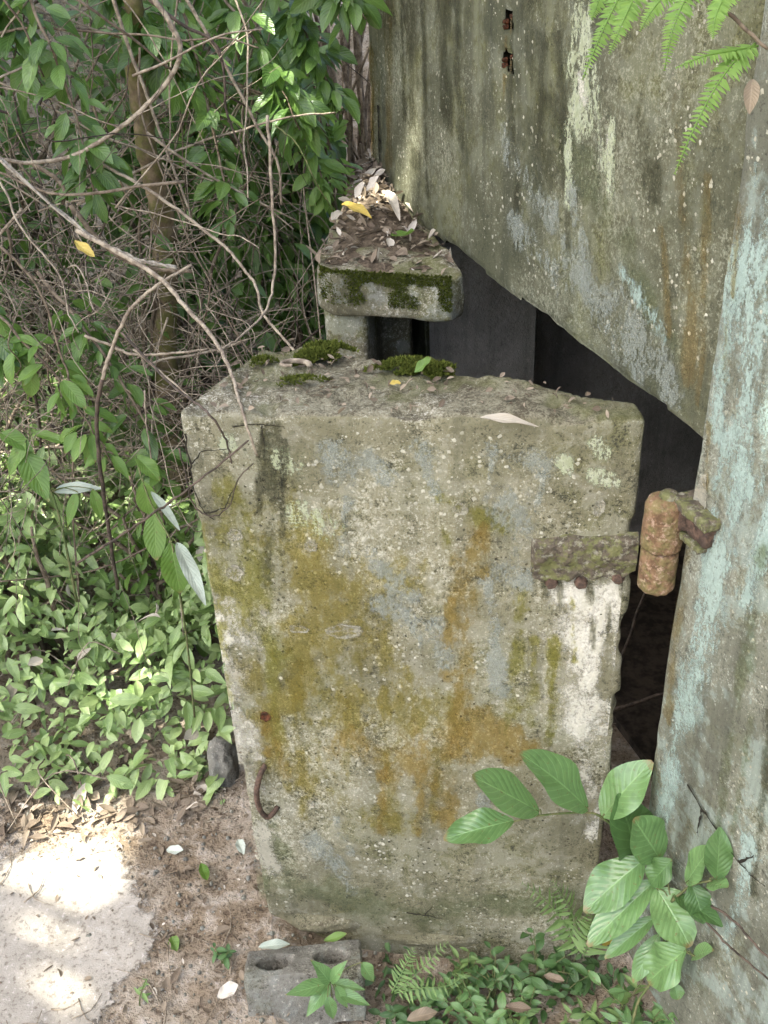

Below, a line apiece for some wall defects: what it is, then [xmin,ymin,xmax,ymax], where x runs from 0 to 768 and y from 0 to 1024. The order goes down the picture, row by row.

leakage [619,267,666,342]
crack [687,784,717,833]
crack [731,852,765,886]